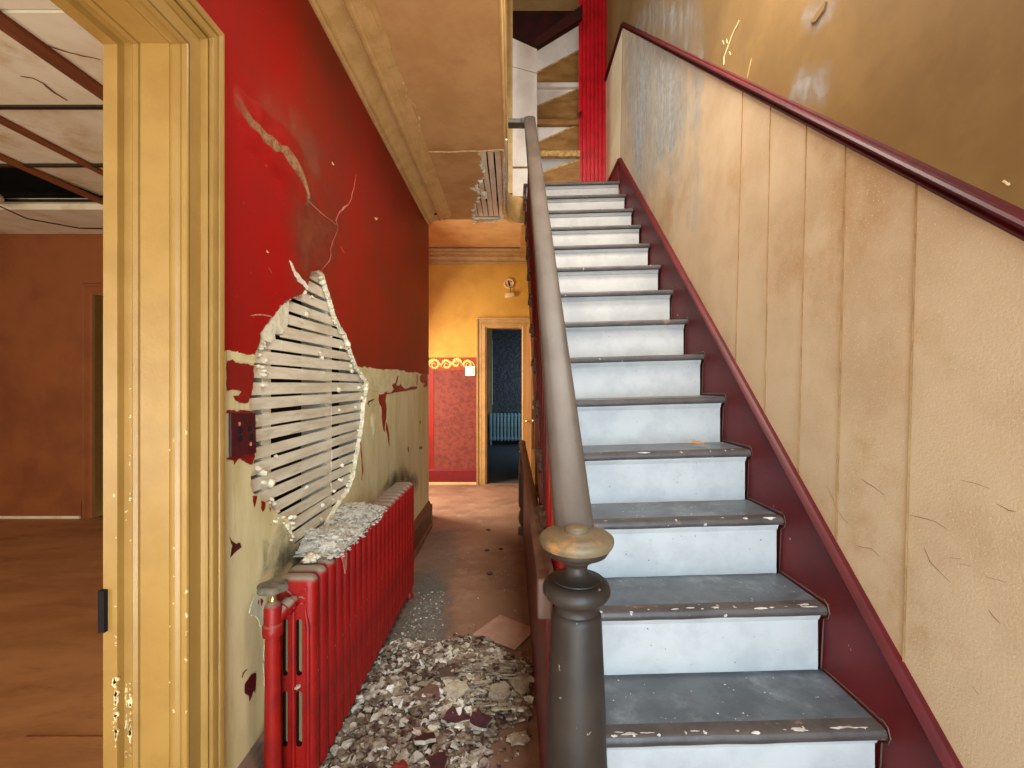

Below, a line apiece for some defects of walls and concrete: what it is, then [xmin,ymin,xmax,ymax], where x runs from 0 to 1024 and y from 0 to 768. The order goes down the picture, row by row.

crack [40,41,100,60]
crack [20,76,68,101]
spalling [470,151,503,203]
crack [309,178,356,273]
flaking render [226,260,368,549]
water stain [264,526,296,570]
spalling [112,677,132,758]